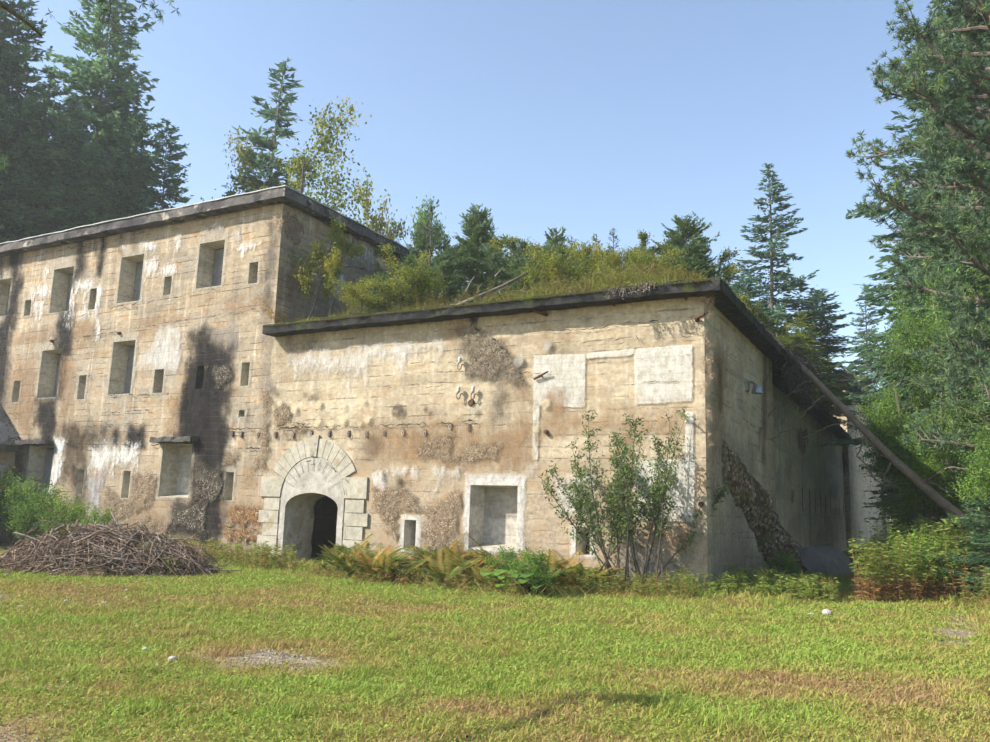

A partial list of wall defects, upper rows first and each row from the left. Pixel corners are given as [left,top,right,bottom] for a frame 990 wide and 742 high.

water stain [0,253,50,403]
water stain [13,236,144,519]
water stain [137,322,237,547]
spalling [460,327,526,387]
spalling [371,485,461,551]